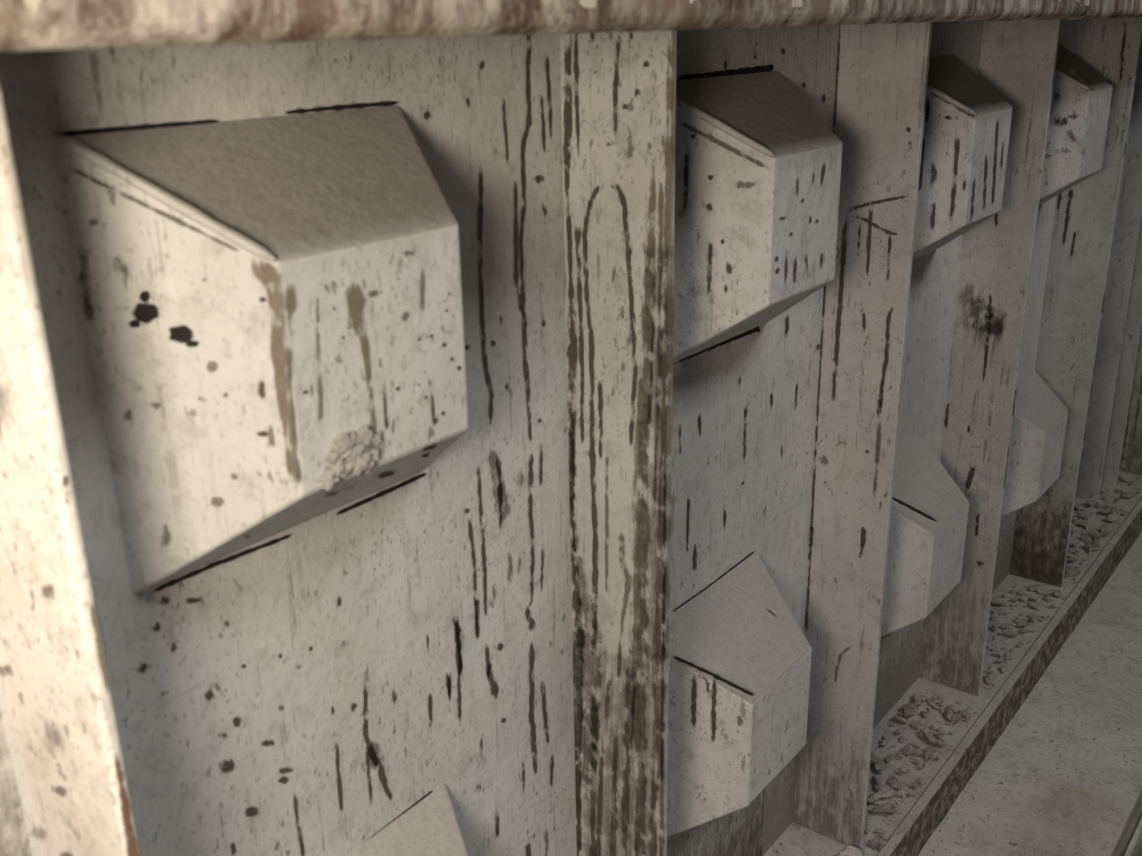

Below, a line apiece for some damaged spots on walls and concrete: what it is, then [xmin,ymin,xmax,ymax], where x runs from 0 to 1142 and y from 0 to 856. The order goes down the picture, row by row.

damp [822,26,840,134]
damp [906,127,937,191]
damp [949,121,1004,226]
damp [612,184,638,444]
damp [775,254,823,282]
damp [574,186,603,652]
damp [805,196,905,630]
damp [966,468,975,489]
damp [687,498,697,570]
corrosion [90,606,109,691]
corrosion [115,758,139,856]